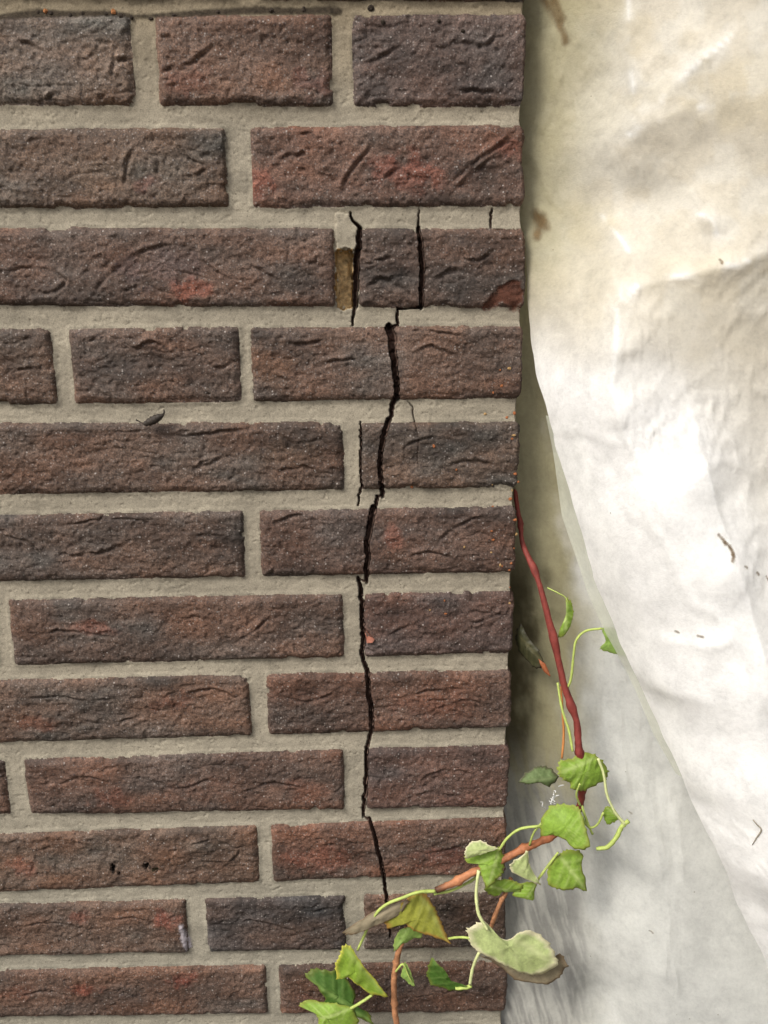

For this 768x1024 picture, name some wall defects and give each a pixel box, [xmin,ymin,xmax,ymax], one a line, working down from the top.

crack [350,213,361,325]
spalling [482,280,523,310]
crack [357,211,425,903]